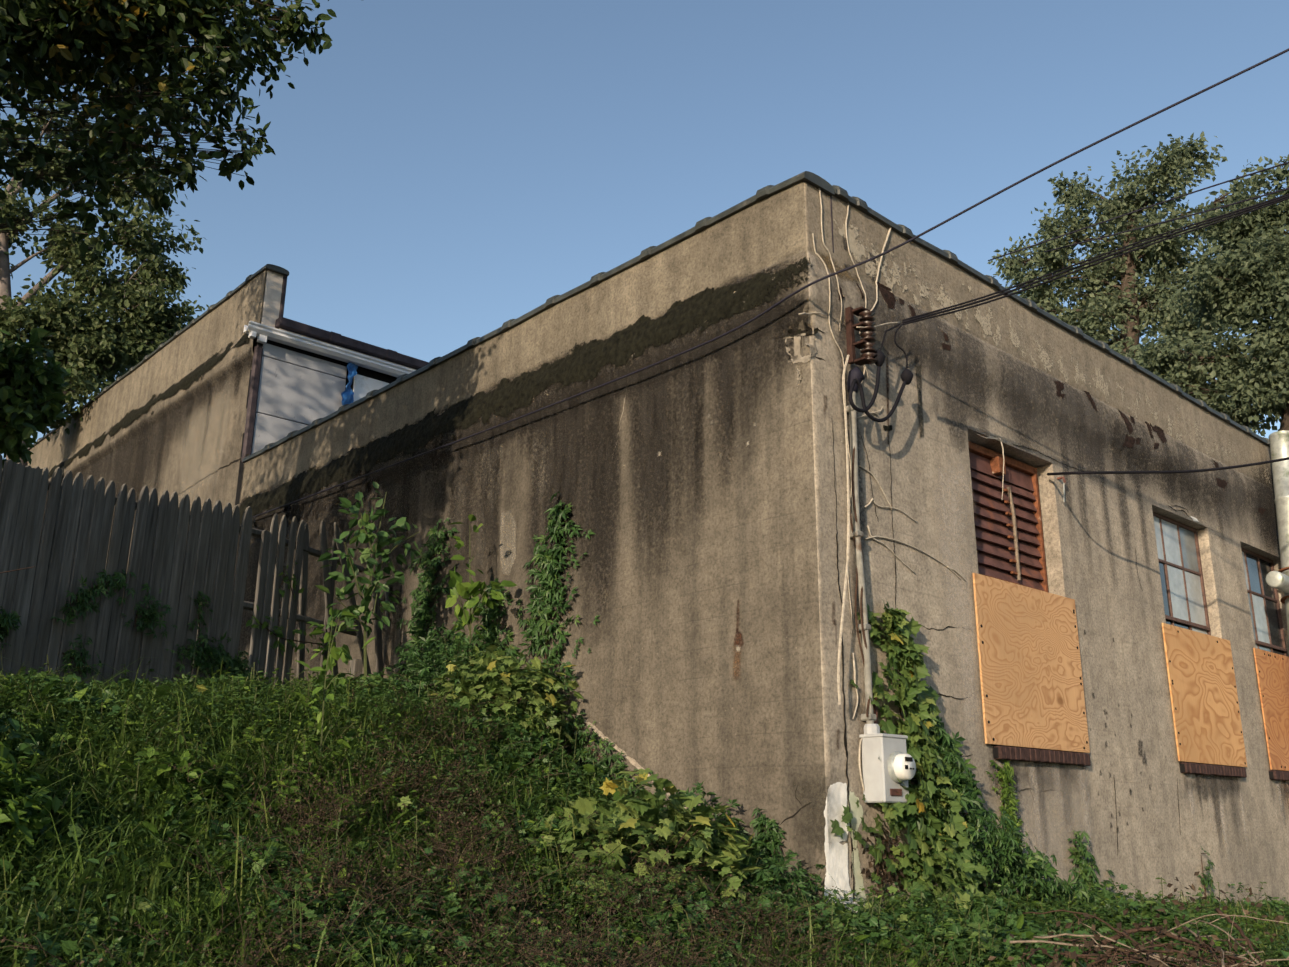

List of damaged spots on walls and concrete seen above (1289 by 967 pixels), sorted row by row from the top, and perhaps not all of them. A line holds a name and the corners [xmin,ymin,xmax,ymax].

leakage [232,263,812,673]
peeling [833,219,1274,489]
leakage [866,285,1279,546]
corrosion [734,600,743,677]